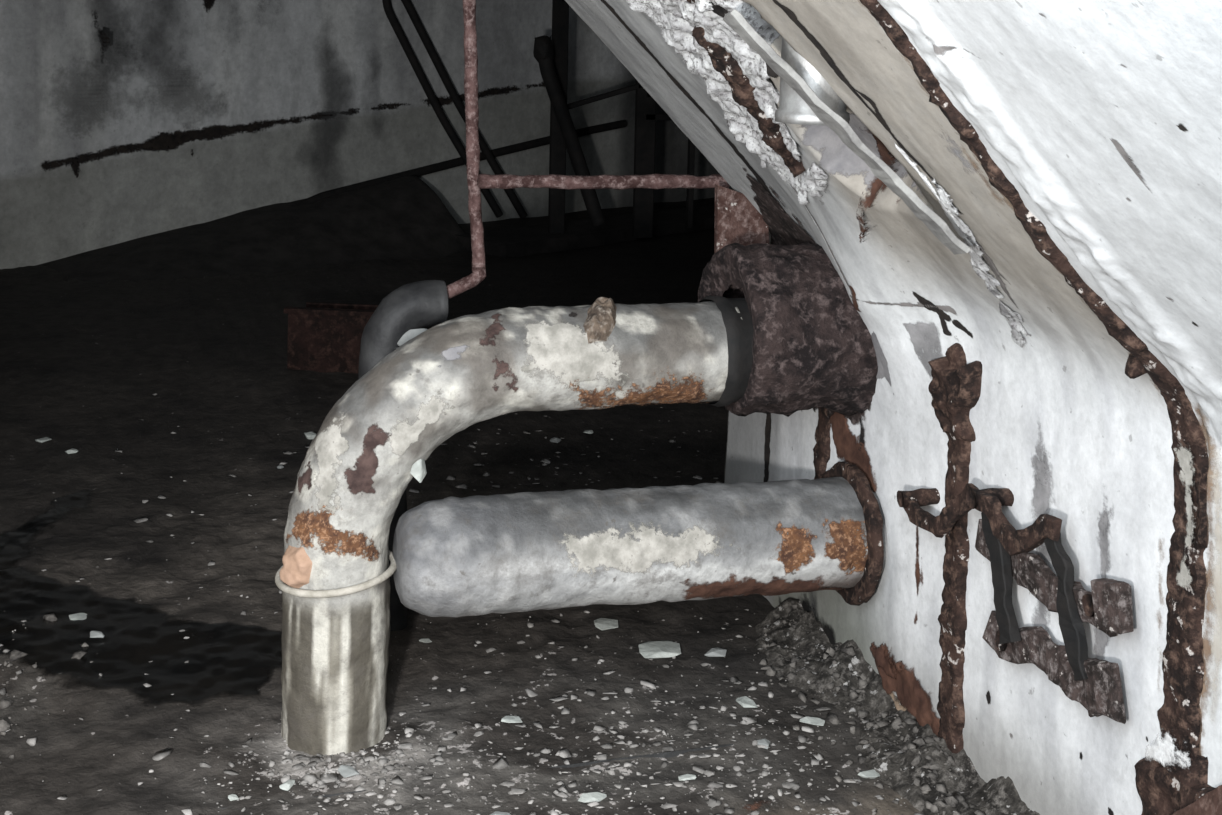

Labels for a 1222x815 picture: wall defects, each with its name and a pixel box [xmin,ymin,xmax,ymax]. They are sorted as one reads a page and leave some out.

water stain [313,49,347,168]
rust [915,526,923,595]
rust [1195,406,1222,718]
rust [870,642,940,736]
rust [1180,783,1215,809]